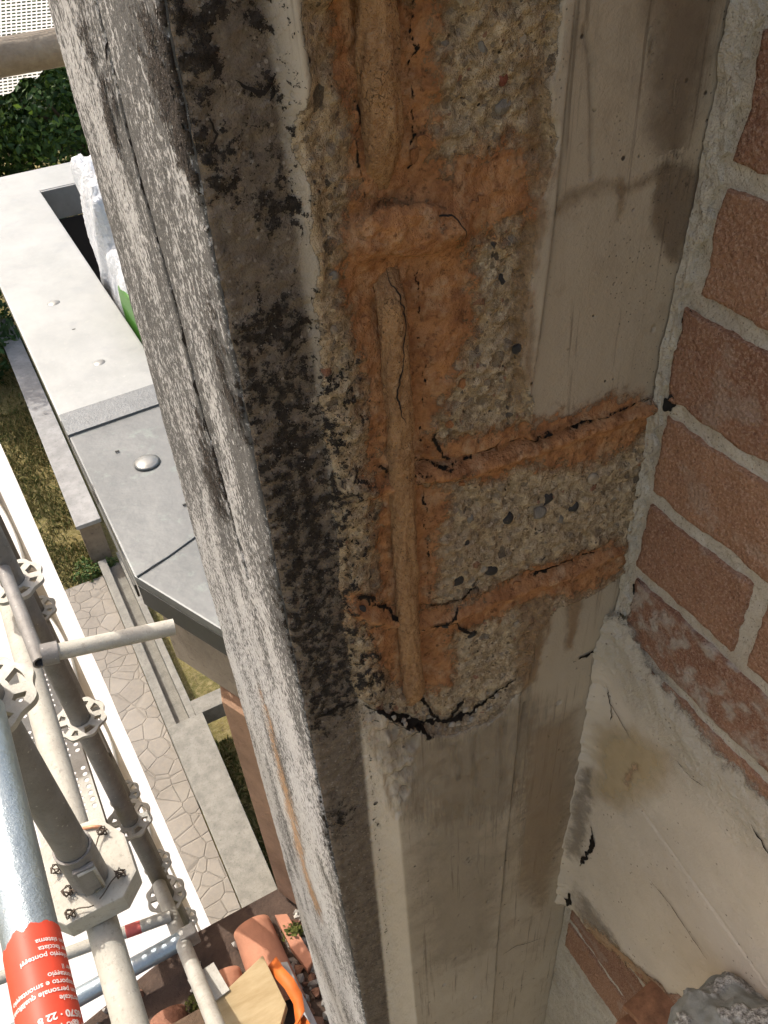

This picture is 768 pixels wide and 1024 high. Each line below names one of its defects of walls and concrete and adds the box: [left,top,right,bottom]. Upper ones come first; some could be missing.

water stain [176,372,238,541]
water stain [128,0,316,240]
water stain [195,280,395,747]
spalling [291,0,525,736]
crack [407,0,420,182]
corrosion [326,0,658,689]
spalling [423,0,562,445]
crack [357,268,649,635]
spalling [418,430,646,618]
water stain [655,168,698,257]
crack [317,675,524,953]
crack [580,828,595,866]